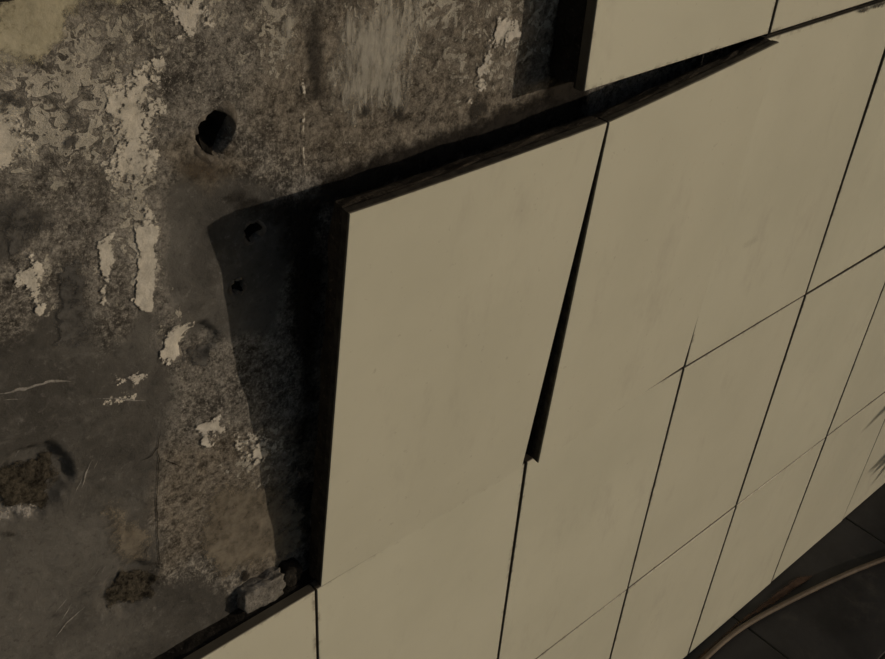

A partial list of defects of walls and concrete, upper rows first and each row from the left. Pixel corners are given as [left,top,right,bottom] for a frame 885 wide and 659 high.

flaking render [0,0,559,659]
water stain [230,4,588,561]
flaking render [578,45,731,119]